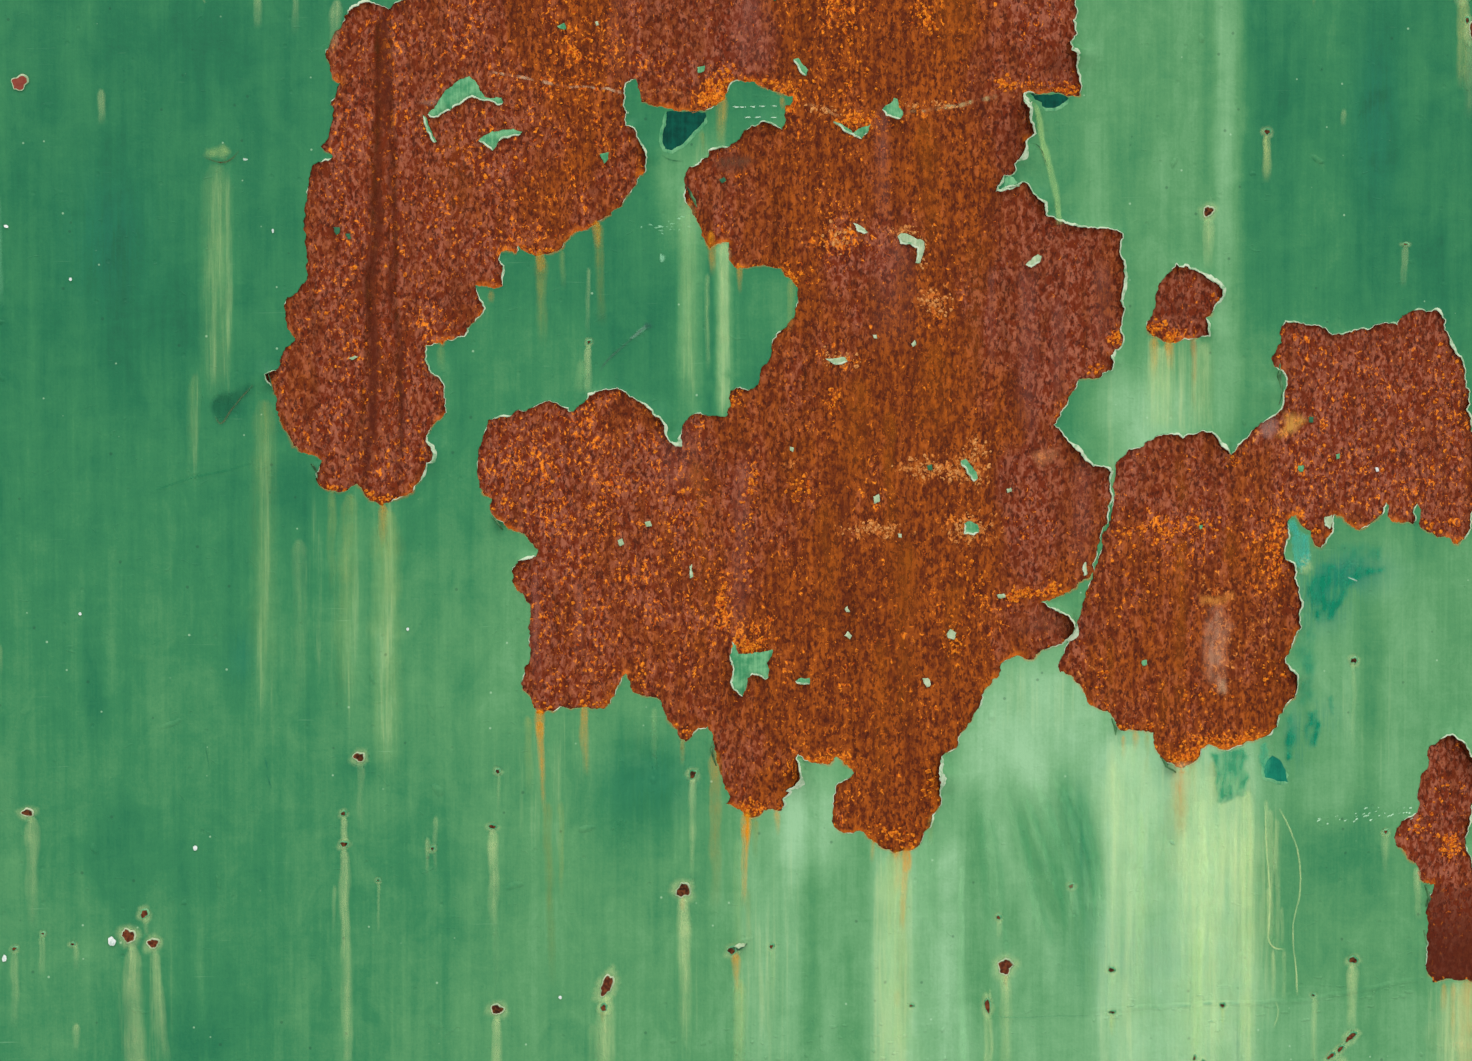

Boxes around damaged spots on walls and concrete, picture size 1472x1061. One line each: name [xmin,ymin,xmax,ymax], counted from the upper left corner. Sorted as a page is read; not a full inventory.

corrosion [11,74,29,91]
peeling [1030,93,1069,111]
peeling [659,111,707,154]
peeling [1001,176,1017,189]
corrosion [264,0,1472,857]
peeling [1292,523,1382,619]
peeling [1212,713,1320,799]
corrosion [675,882,691,898]
corrosion [121,908,160,949]
corrosion [997,958,1014,976]
corrosion [600,974,615,1012]